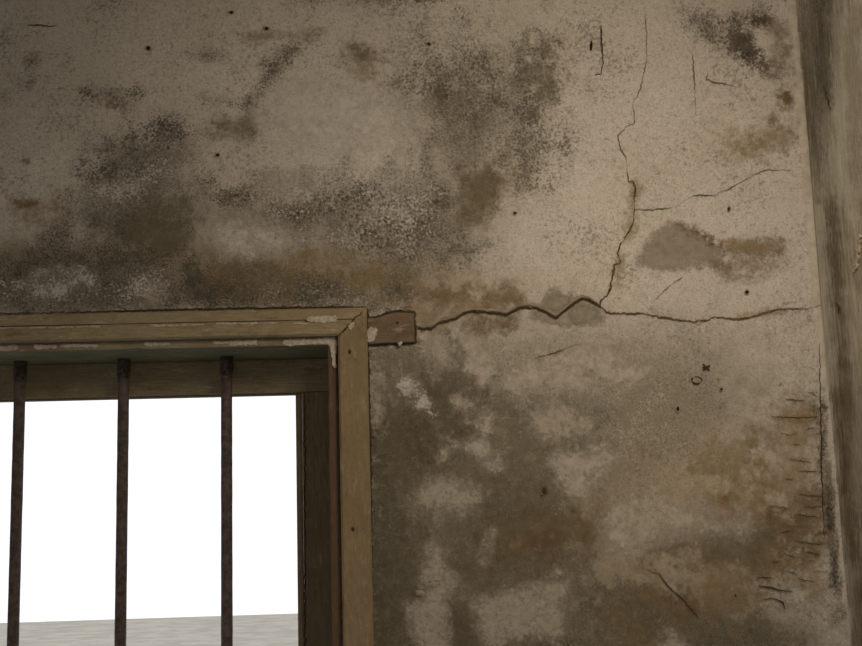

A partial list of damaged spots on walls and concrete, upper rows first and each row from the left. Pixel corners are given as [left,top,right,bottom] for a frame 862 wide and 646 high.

leakage [0,22,570,314]
leakage [533,289,603,327]
crack [417,19,840,330]
leakage [638,223,784,275]
leakage [686,5,792,79]
leakage [369,326,805,646]